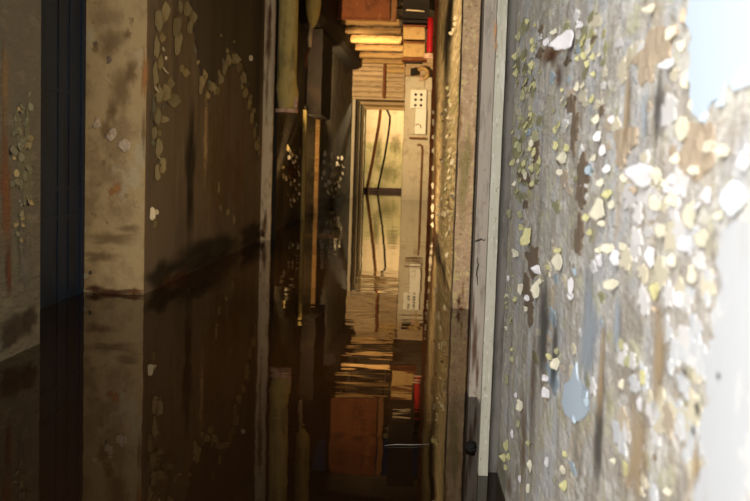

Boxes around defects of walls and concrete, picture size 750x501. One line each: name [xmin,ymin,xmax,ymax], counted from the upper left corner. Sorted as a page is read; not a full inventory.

peeling [10,91,35,243]
peeling [92,117,131,152]
peeling [150,0,263,181]
peeling [504,0,750,501]
peeling [498,392,523,471]